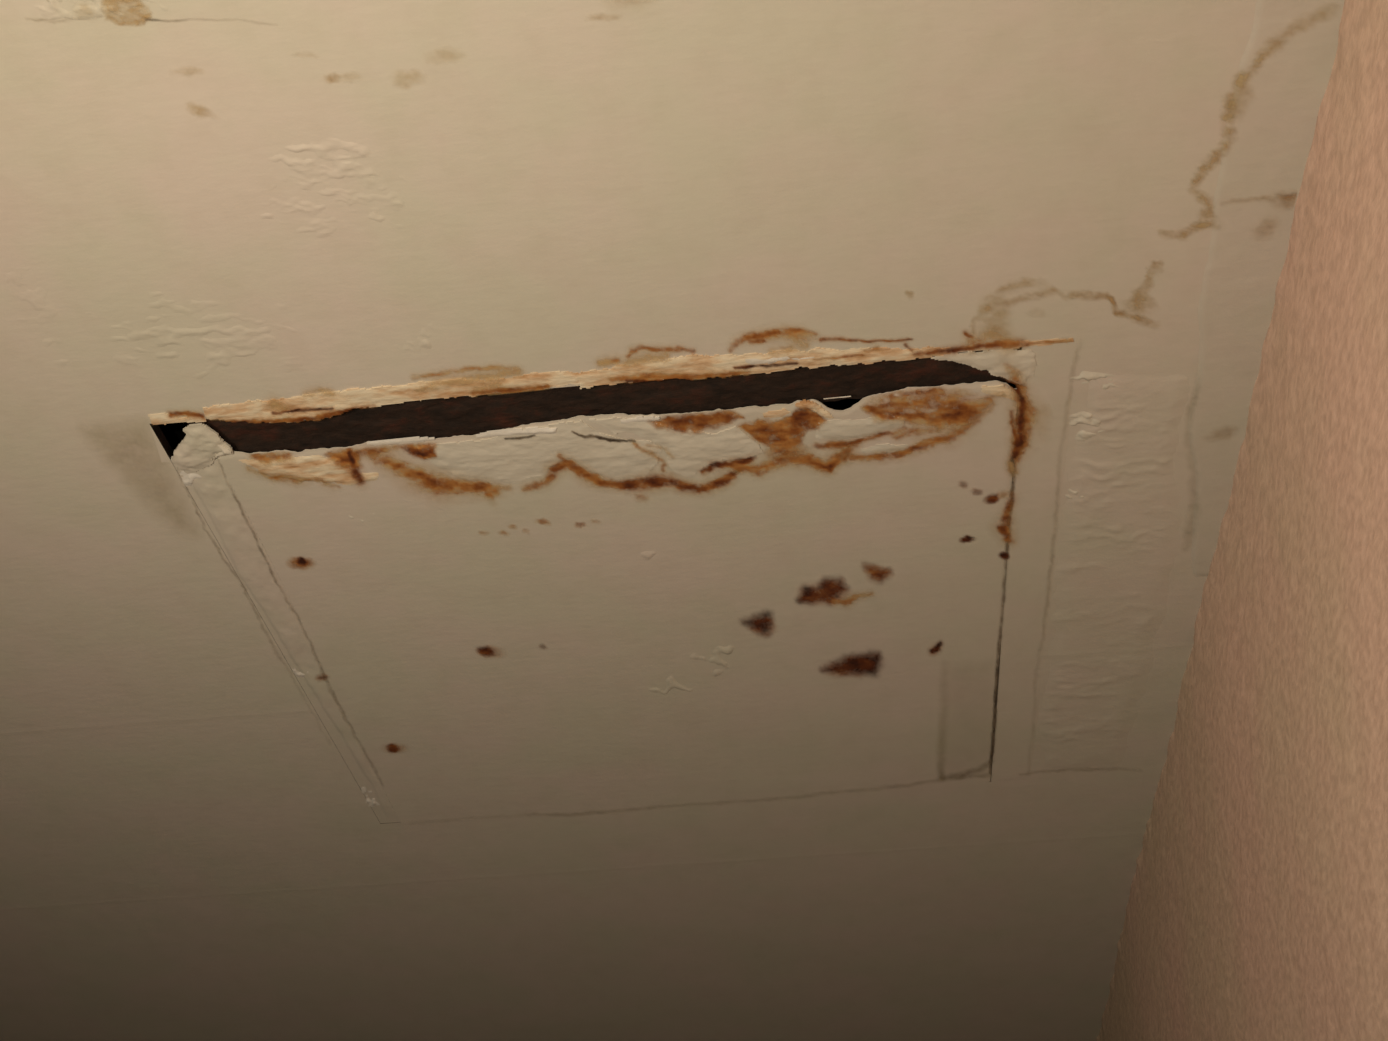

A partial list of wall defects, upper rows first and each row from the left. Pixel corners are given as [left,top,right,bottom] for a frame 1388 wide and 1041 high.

rust [169,411,204,419]
rust [226,389,366,423]
rust [421,366,550,396]
peeling [148,338,1074,486]
rust [524,388,993,493]
rust [597,328,1071,382]
rust [1007,370,1036,473]
rust [327,444,501,499]
rust [987,495,1012,559]
rust [798,566,890,605]
rust [744,614,772,635]
rust [824,654,880,675]